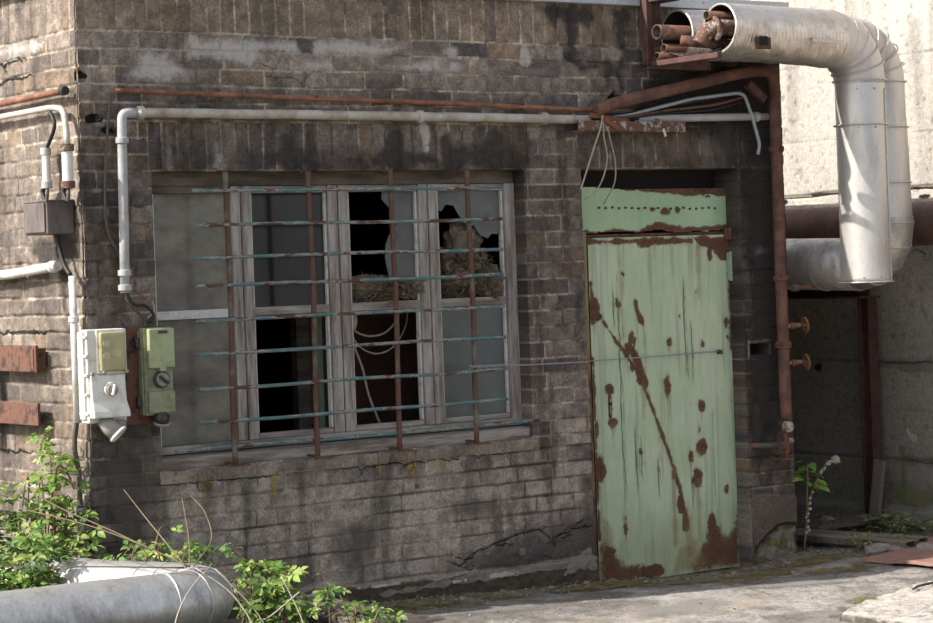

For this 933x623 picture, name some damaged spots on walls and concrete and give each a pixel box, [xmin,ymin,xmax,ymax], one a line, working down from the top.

rust [724,280,732,350]
rust [589,282,690,531]
rust [592,357,664,580]
rust [689,428,707,487]
crack [454,517,591,571]
rust [694,513,739,570]